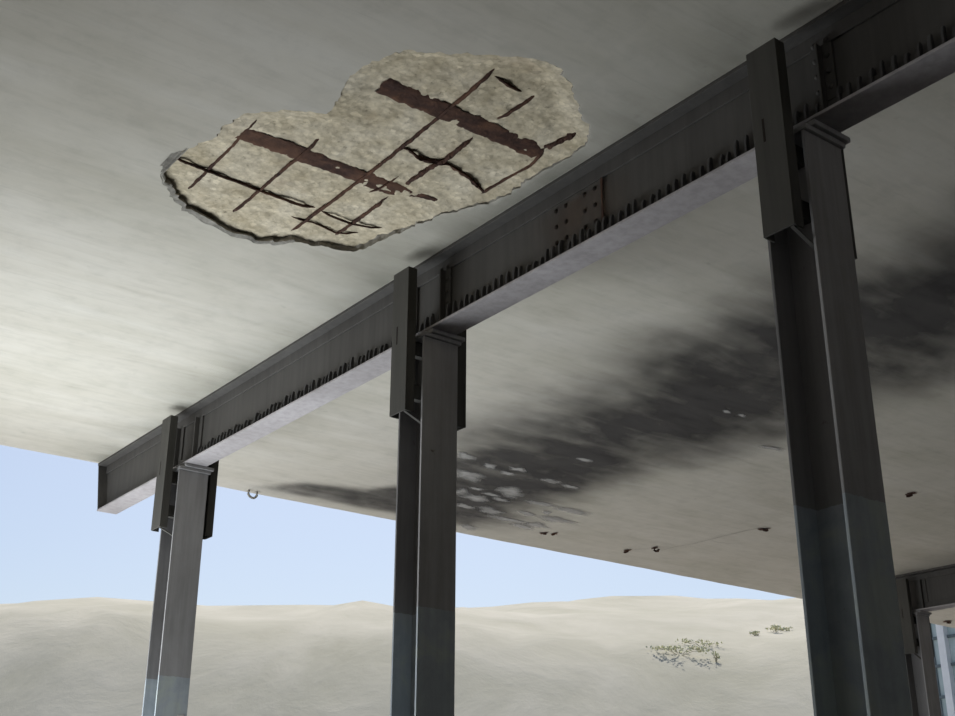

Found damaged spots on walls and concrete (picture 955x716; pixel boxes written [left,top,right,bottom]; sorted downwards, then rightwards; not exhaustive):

spalling [160,50,590,252]